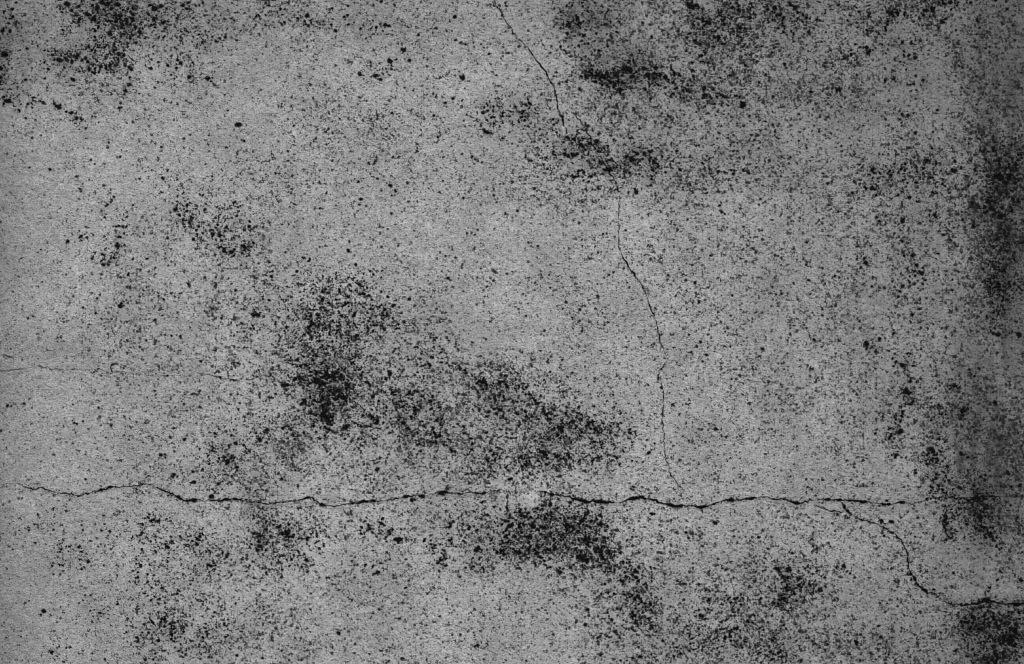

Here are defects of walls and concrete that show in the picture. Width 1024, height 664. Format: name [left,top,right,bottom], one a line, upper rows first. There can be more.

crack [2,477,515,512]
crack [494,1,1024,609]